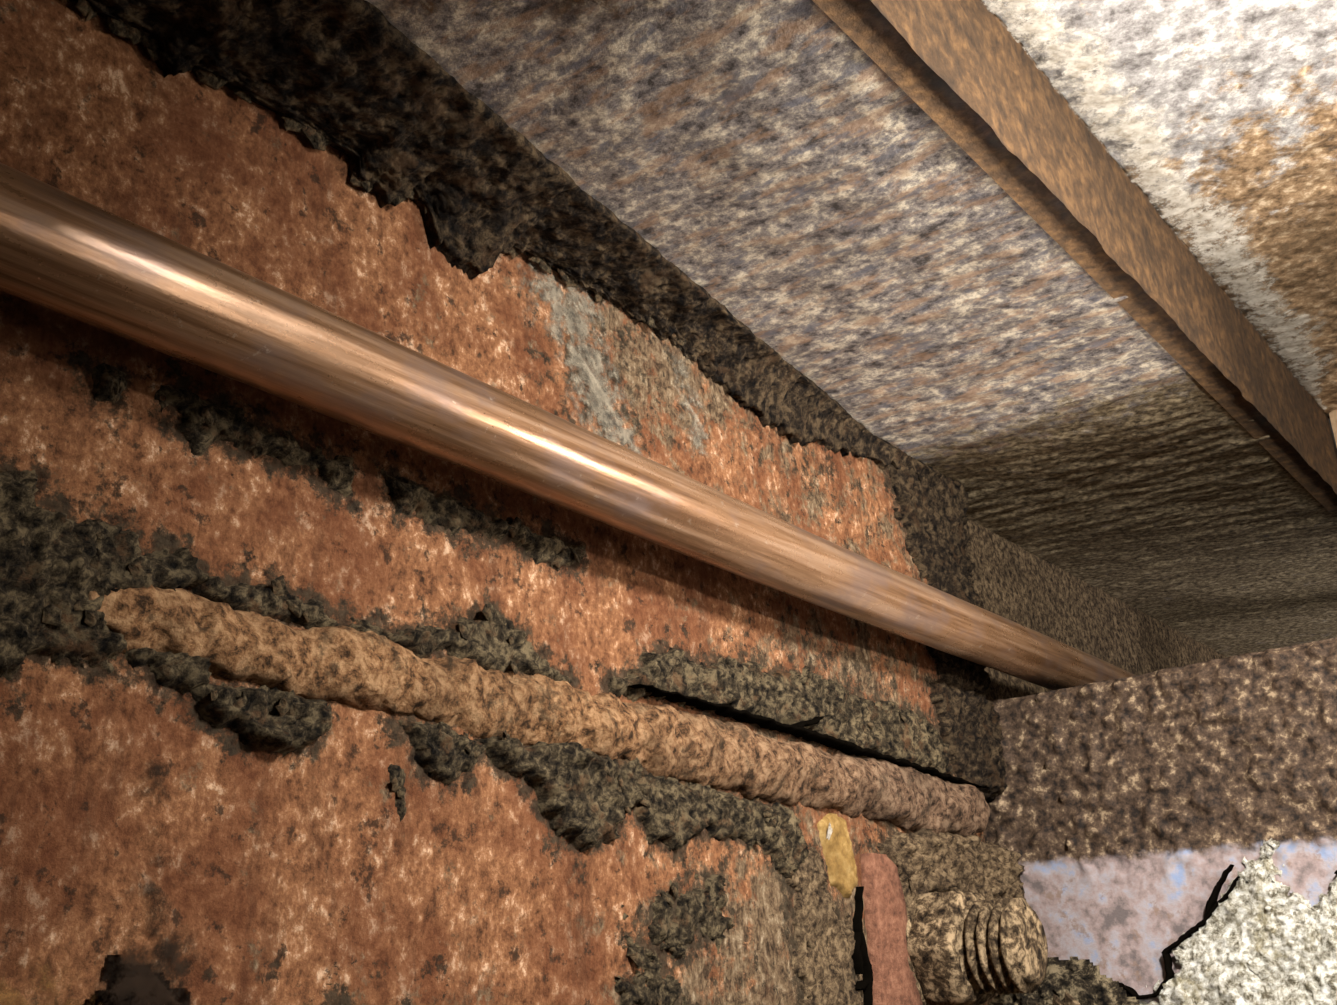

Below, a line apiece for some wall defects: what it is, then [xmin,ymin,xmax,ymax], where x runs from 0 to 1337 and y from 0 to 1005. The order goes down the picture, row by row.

peeling [281,114,331,151]
peeling [508,246,579,287]
crack [630,684,989,788]
peeling [817,813,858,898]
rust [103,883,191,1005]